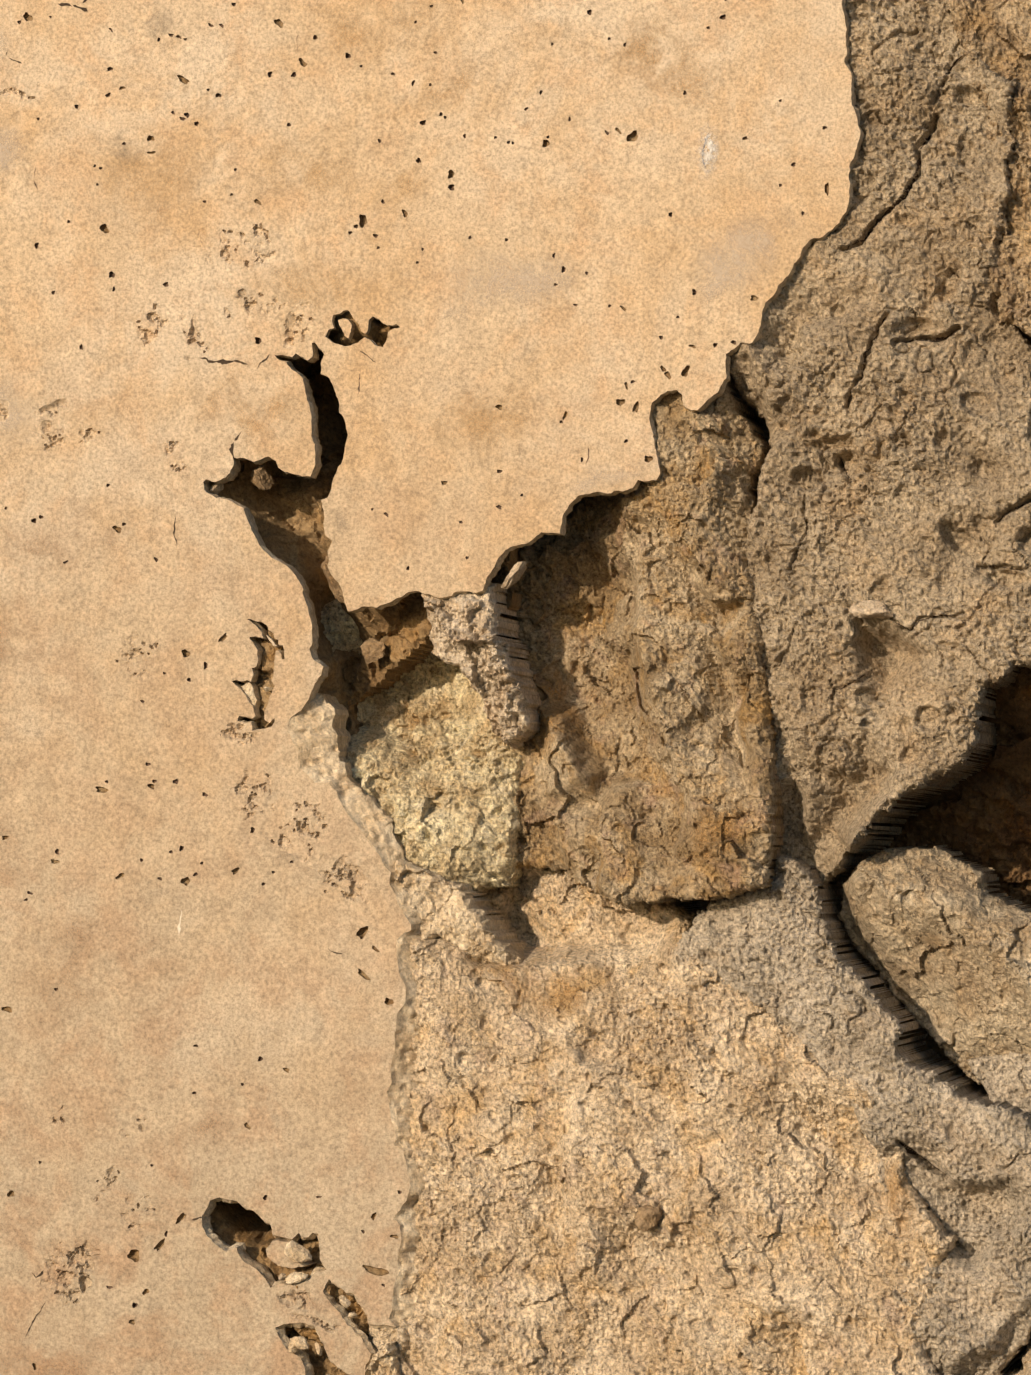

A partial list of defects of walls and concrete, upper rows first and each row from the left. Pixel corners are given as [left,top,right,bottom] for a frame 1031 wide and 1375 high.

crack [201,342,338,700]
spalling [348,0,865,614]
crack [503,377,785,905]
crack [847,55,964,250]
spalling [92,619,426,1375]